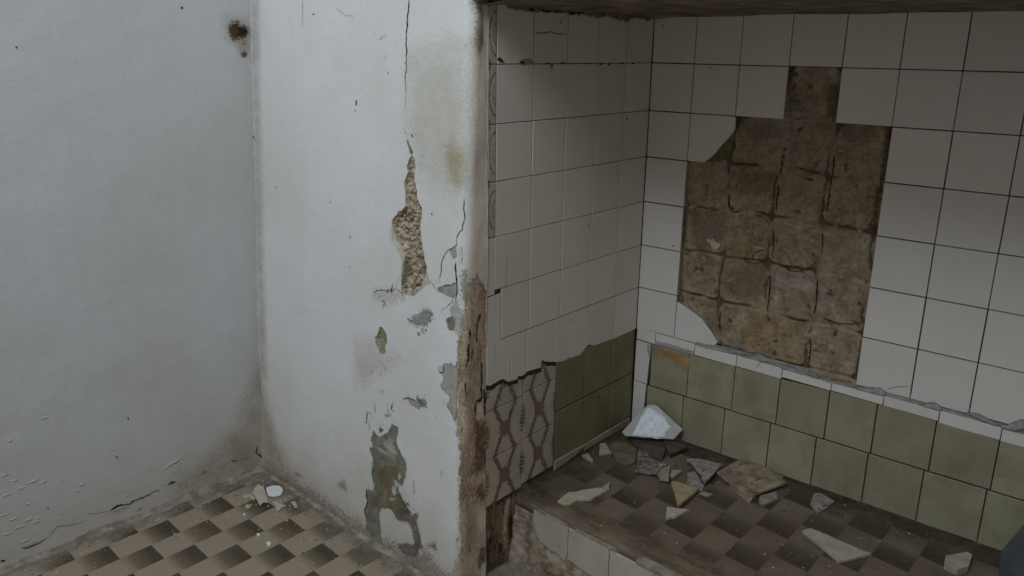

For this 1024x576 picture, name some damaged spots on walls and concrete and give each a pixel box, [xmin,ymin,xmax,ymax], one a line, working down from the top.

rust [228,21,248,41]
crack [375,0,409,98]
crack [432,203,466,312]
peeling [678,66,893,383]
flaking render [392,139,521,576]
crack [95,481,175,514]
peeling [364,424,437,558]
spalling [557,481,610,506]